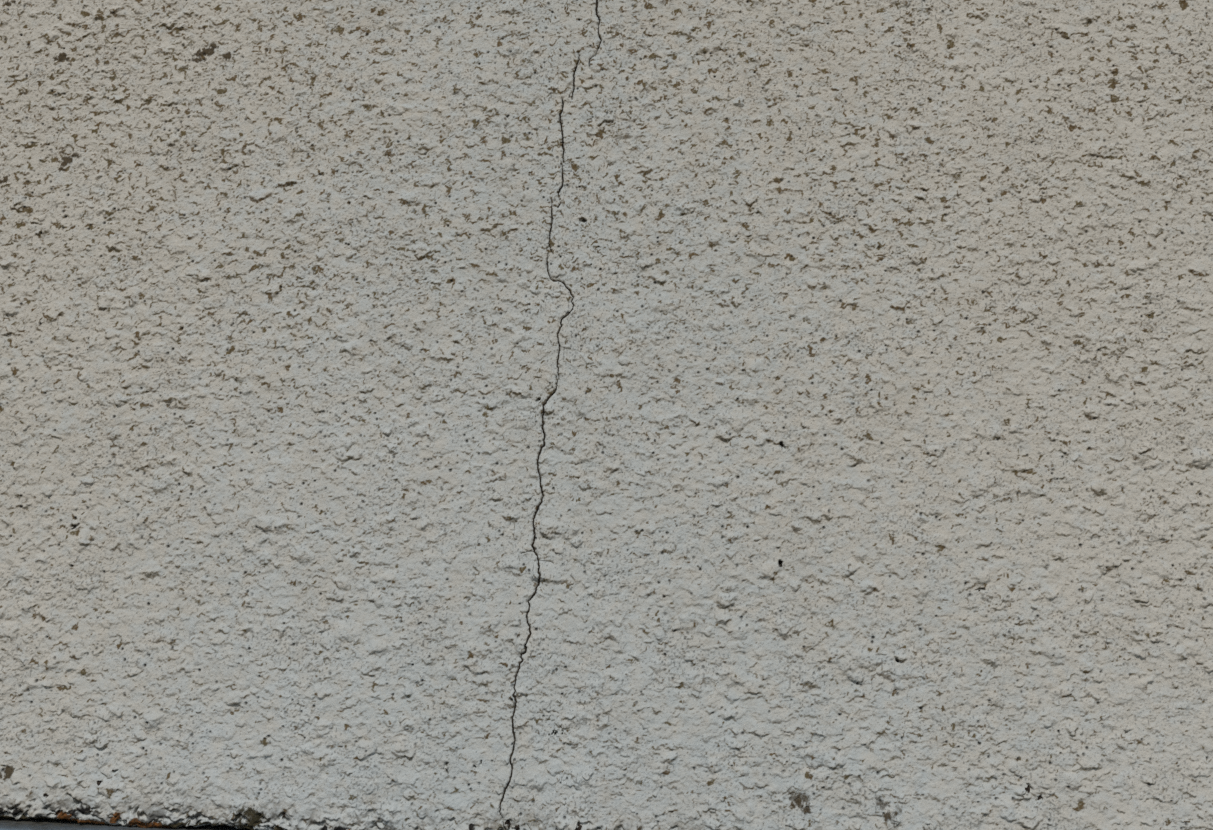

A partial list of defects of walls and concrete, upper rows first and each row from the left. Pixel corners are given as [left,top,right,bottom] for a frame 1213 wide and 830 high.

crack [499,0,602,828]